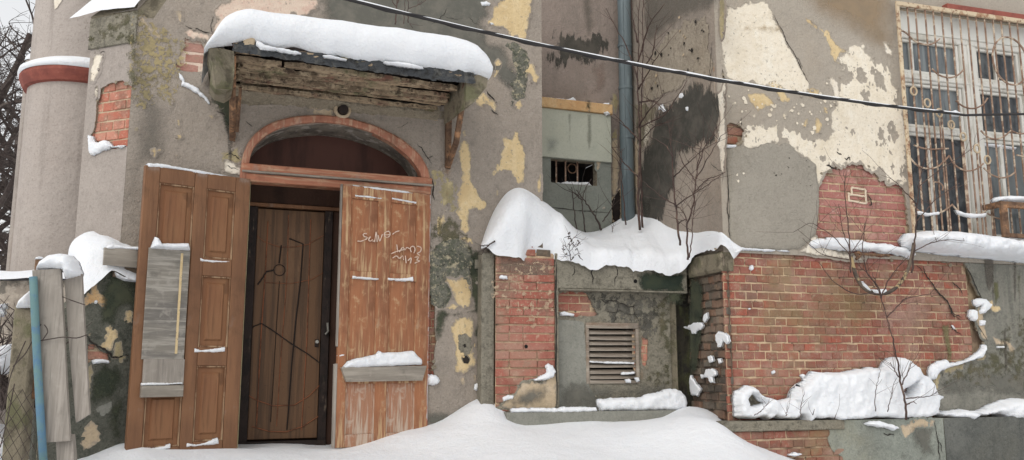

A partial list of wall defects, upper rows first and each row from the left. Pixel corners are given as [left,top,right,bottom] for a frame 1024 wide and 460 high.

spalling [88,52,138,149]
damp [127,36,178,109]
peeling [175,0,320,72]
peeling [474,0,541,114]
damp [547,33,608,69]
spalling [428,128,489,376]
peeling [490,129,543,195]
damp [639,82,719,221]
spalling [713,0,1017,421]
spalling [558,291,597,318]
peeling [77,283,134,454]